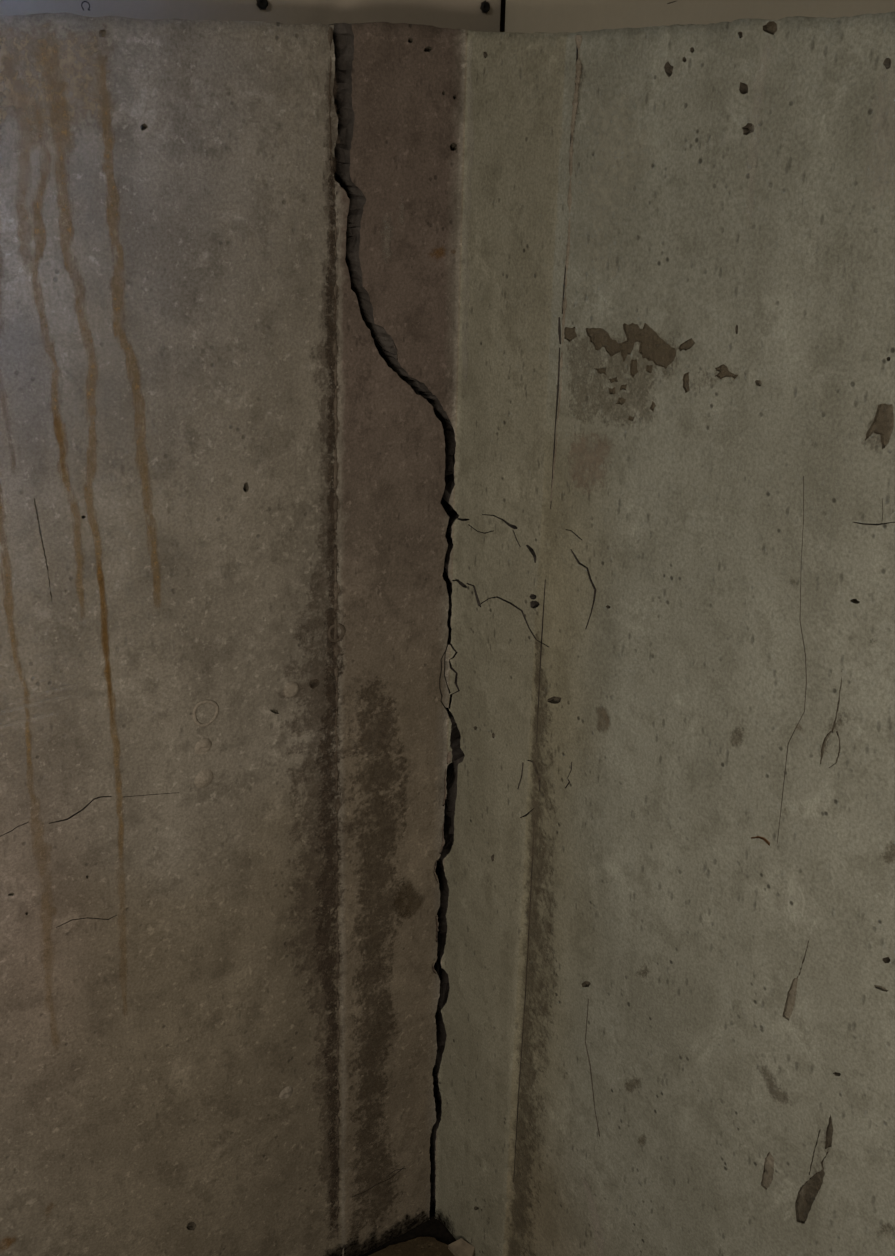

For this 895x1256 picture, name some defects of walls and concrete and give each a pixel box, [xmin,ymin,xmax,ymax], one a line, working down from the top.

spalling [564,323,695,421]
spalling [865,404,894,449]
crack [566,529,596,629]
crack [326,23,549,1256]
crack [0,792,179,837]
crack [517,760,572,818]
crack [585,999,600,1137]
spalling [795,1114,833,1224]